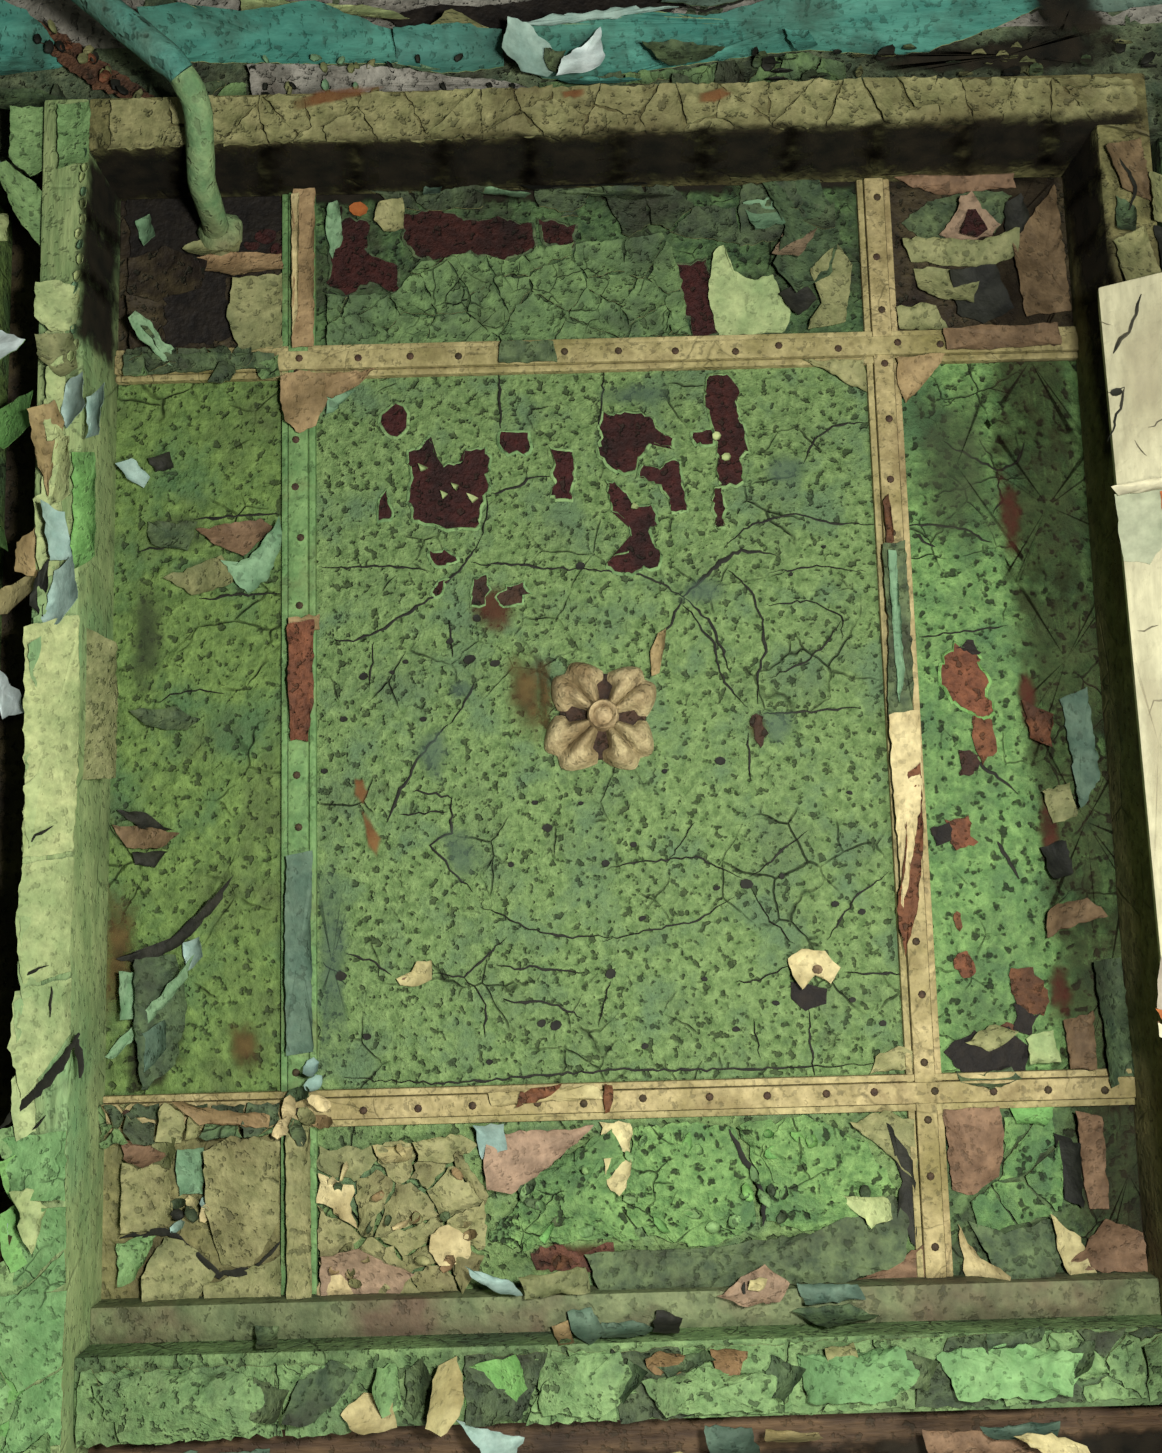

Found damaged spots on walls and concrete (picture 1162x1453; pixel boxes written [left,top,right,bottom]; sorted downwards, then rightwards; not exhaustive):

crack [108,75,1139,151]
peeling [894,173,1072,403]
rust [883,494,894,546]
peeling [0,0,200,1453]
rust [286,614,320,742]
crack [322,476,888,1038]
rust [889,710,978,957]
peeling [98,851,333,1302]
crack [345,1012,874,1085]
crack [847,969,899,977]
rust [1001,967,1050,1035]
peeling [75,1103,1162,1453]